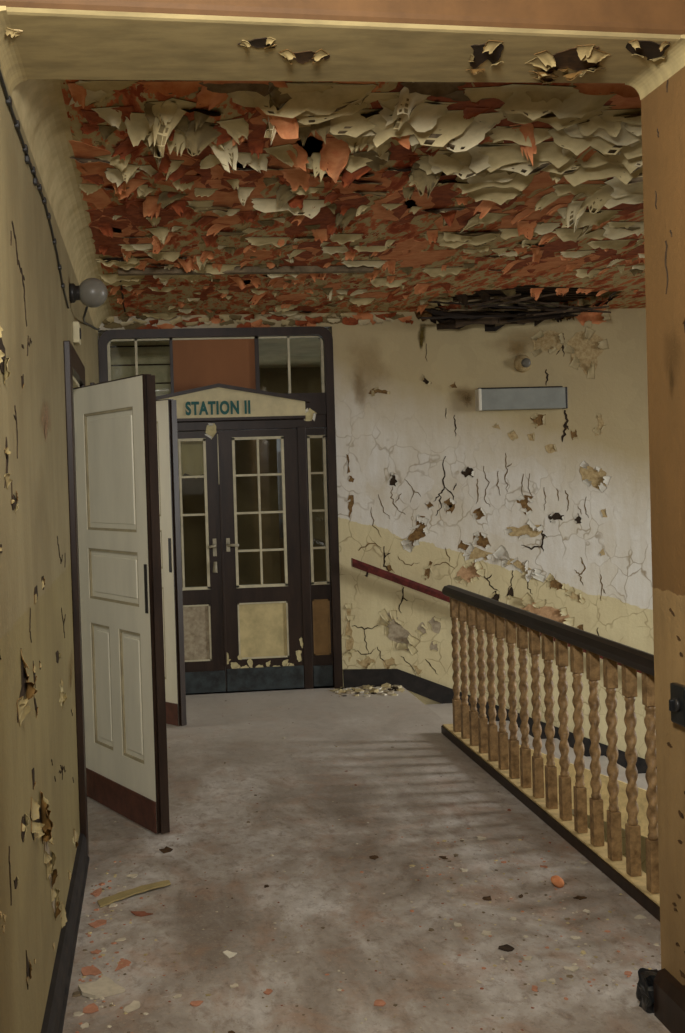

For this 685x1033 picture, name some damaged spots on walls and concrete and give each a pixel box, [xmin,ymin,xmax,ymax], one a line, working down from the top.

peeling [626,39,670,61]
peeling [67,37,645,329]
crack [561,410,569,442]
peeling [401,498,456,552]
crack [358,453,589,611]
flaking render [454,495,586,631]
crack [575,558,605,599]
peeling [17,649,42,727]
peeling [227,638,303,669]
flaking render [342,603,442,676]
crack [354,625,437,674]
peeling [21,768,72,929]